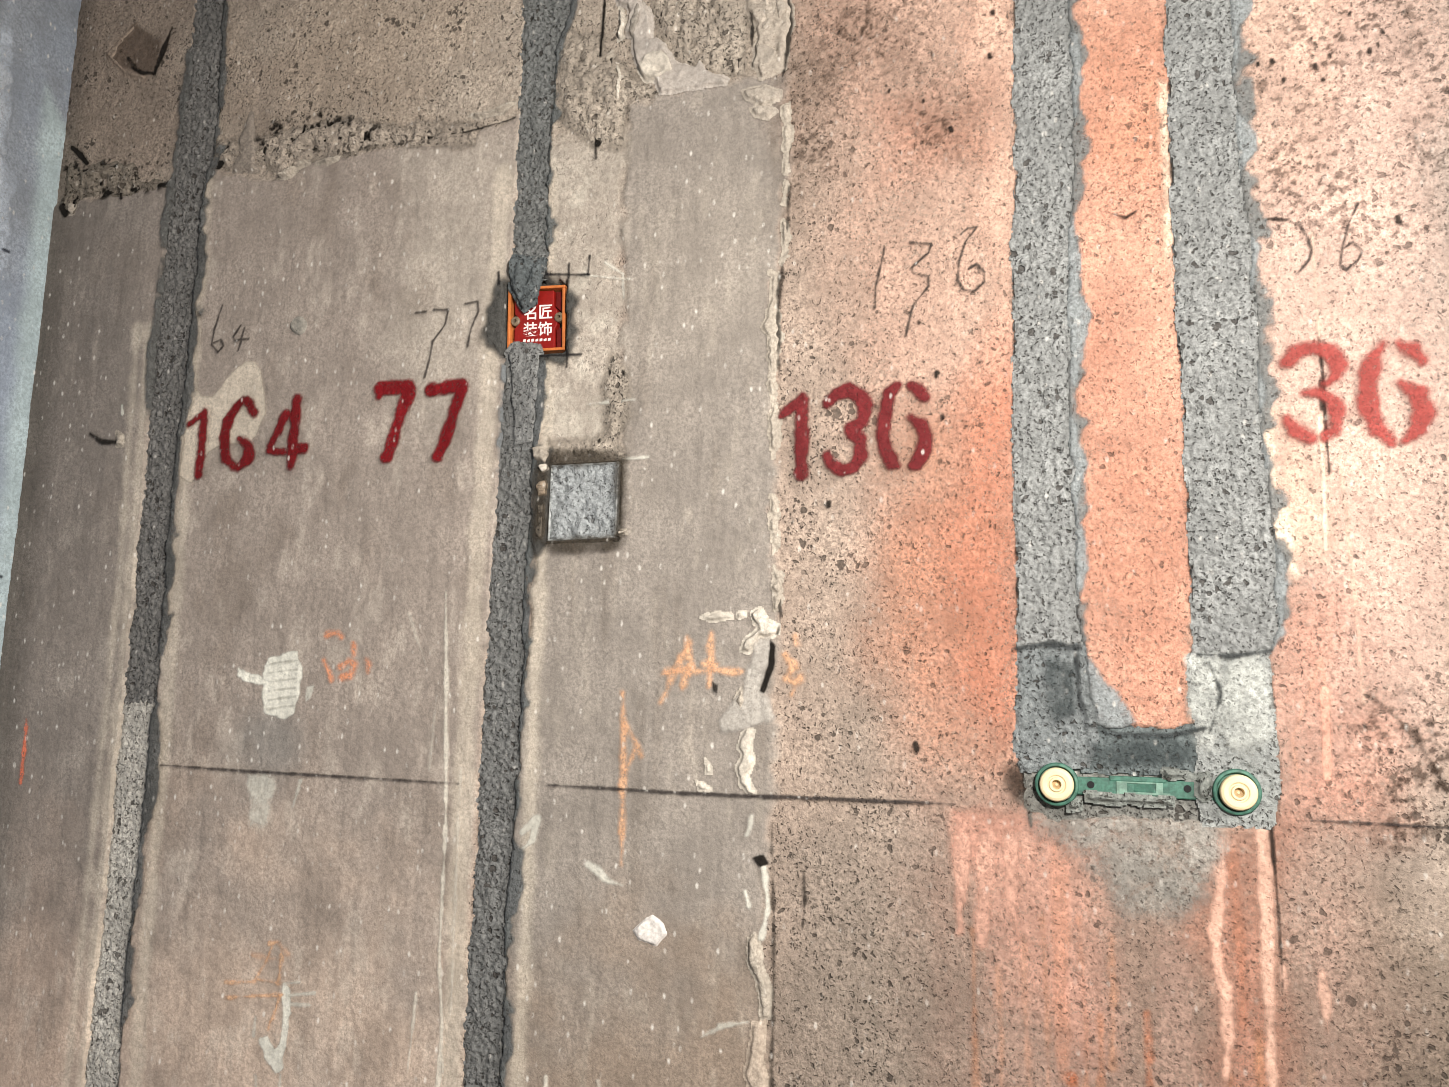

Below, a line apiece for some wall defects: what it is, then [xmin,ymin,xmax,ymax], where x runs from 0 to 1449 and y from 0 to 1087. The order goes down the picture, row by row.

spalling [67,146,89,172]
flaking render [557,0,796,460]
spalling [532,353,648,472]
corrosion [977,828,1126,1087]
corrosion [1151,856,1270,1087]
corrosion [1281,841,1342,994]